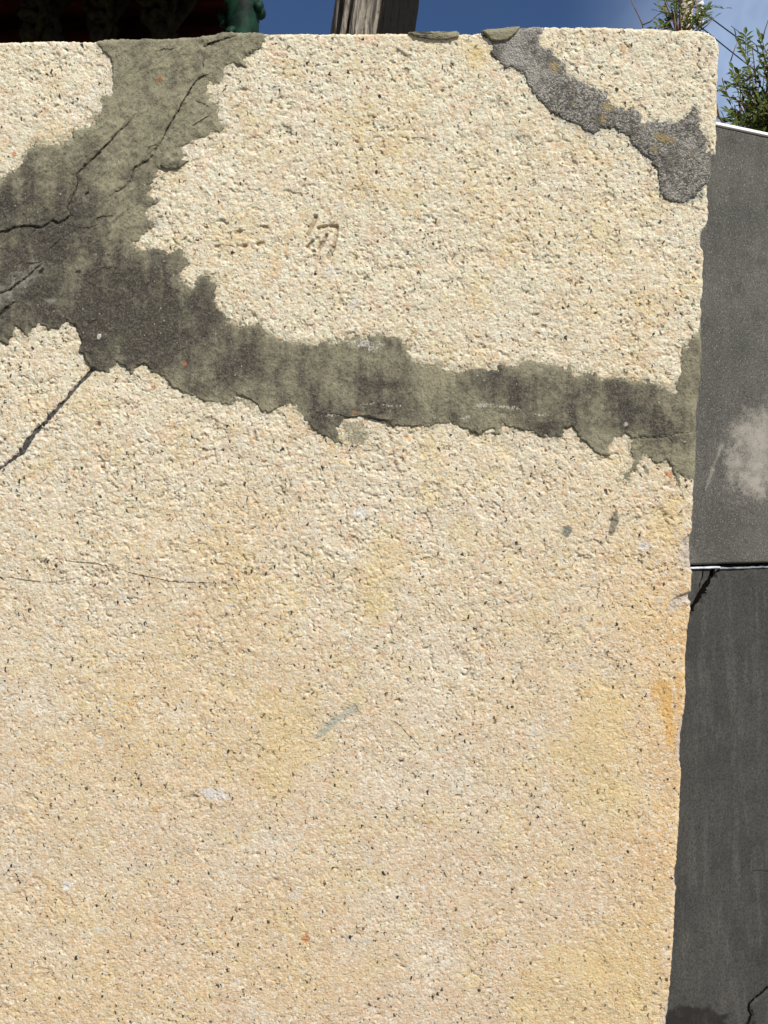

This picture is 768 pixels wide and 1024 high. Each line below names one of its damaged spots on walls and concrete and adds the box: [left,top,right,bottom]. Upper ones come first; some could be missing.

leakage [448,33,502,95]
crack [0,35,234,315]
leakage [0,246,62,321]
leakage [341,334,393,358]
crack [0,353,96,469]
leakage [456,400,553,423]